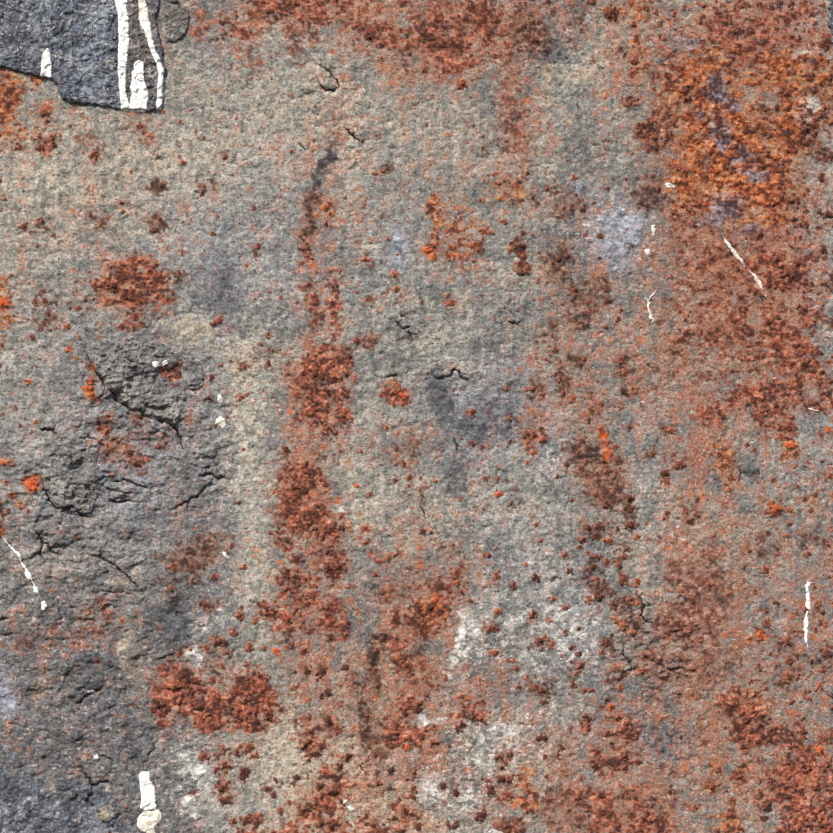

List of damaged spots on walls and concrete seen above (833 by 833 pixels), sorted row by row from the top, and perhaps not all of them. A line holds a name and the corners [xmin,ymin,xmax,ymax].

peeling [0,0,190,113]
rust [188,0,596,219]
rust [566,0,833,513]
crack [85,352,188,452]
peeling [89,340,205,426]
peeling [40,432,100,514]
crack [100,478,150,504]
crack [172,466,225,510]
crack [36,531,61,560]
rust [151,444,474,833]
rust [551,392,833,833]
peeling [0,744,143,833]